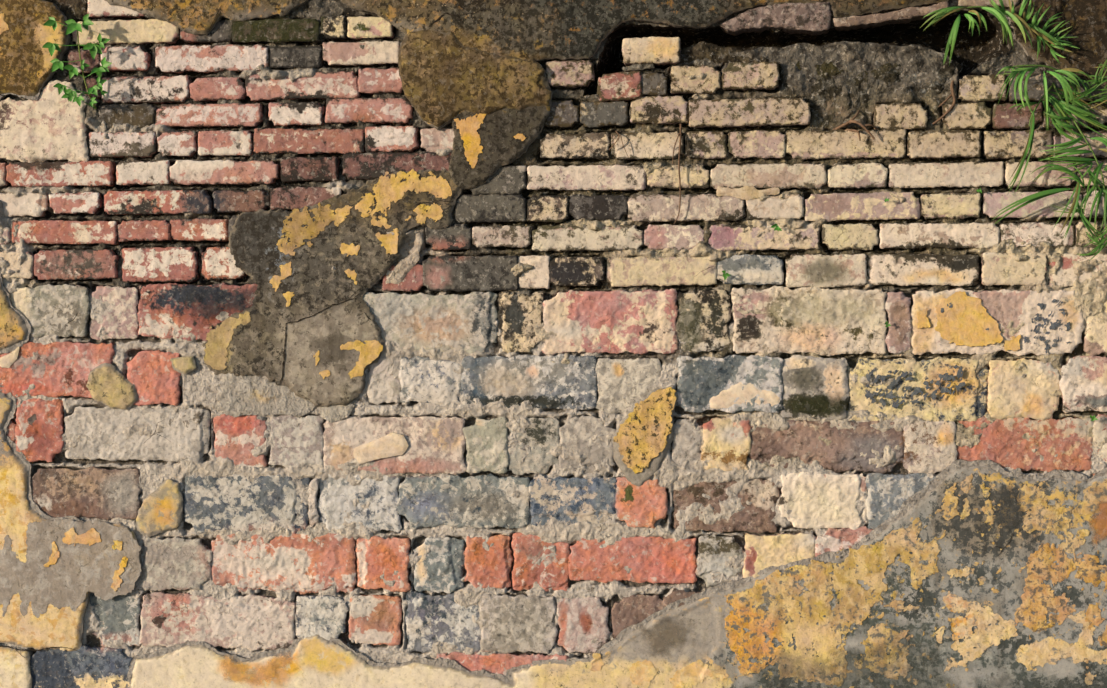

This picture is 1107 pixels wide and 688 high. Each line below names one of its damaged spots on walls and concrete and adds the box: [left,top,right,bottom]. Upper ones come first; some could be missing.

spalling [956,8,999,21]
spalling [0,88,43,101]
peeling [454,113,486,169]
peeling [355,169,452,229]
peeling [276,202,353,256]
peeling [340,243,360,256]
peeling [375,228,399,255]
peeling [269,262,292,292]
peeling [340,340,383,379]
peeling [935,473,1003,528]
peeling [724,517,947,687]
peeling [941,483,1107,685]